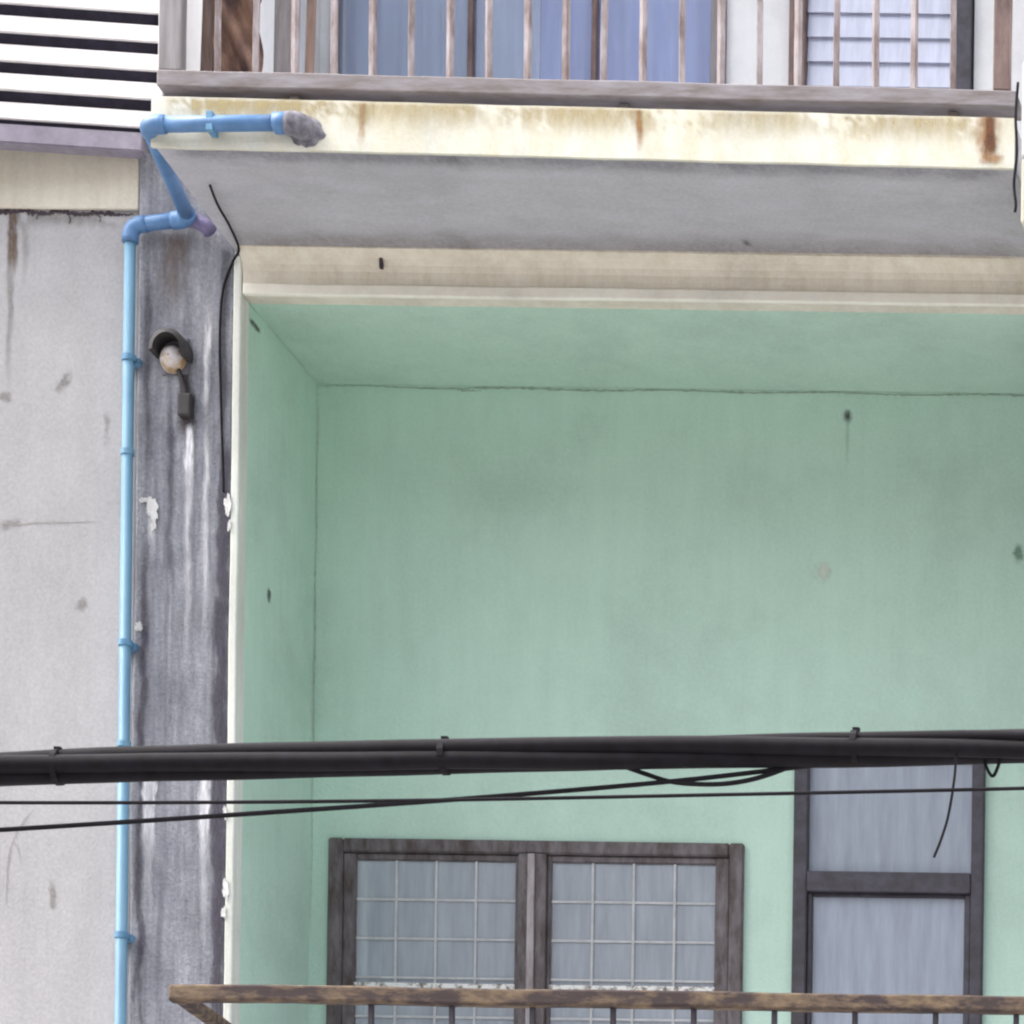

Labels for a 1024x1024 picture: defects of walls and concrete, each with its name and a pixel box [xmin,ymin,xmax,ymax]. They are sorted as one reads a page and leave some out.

rust [980,117,998,161]
damp [8,209,17,262]
damp [179,304,227,401]
damp [169,417,195,483]
peeling [139,496,159,537]
peeling [223,493,232,532]
damp [204,449,230,744]
damp [137,573,147,746]
damp [134,781,157,984]
damp [199,780,225,984]